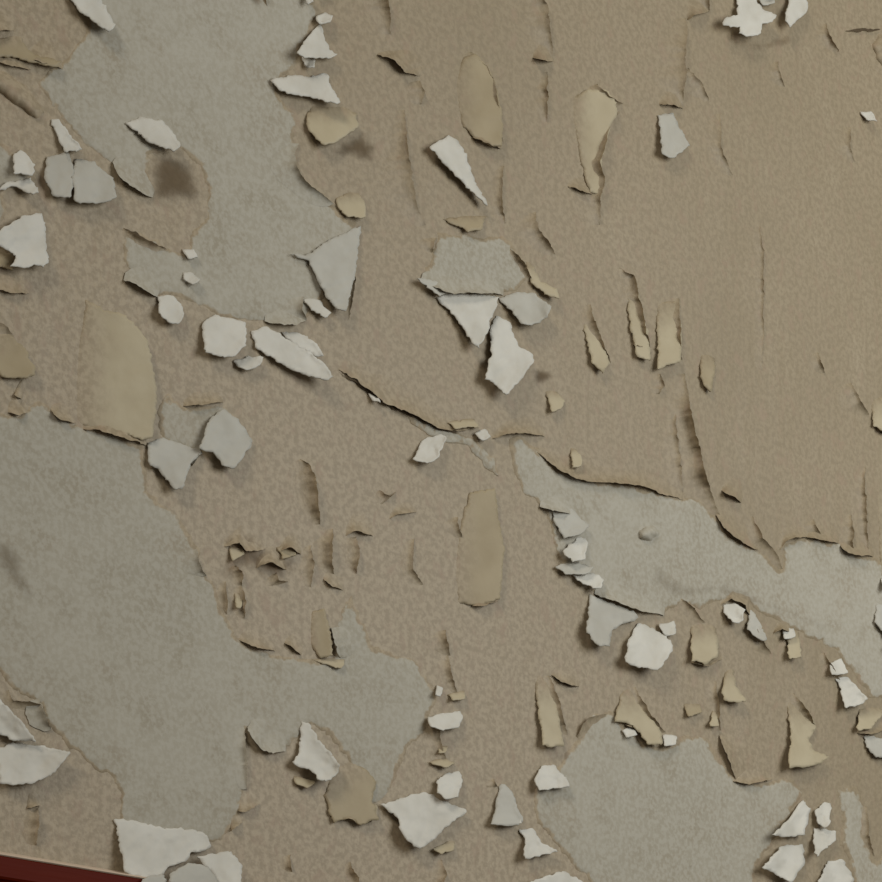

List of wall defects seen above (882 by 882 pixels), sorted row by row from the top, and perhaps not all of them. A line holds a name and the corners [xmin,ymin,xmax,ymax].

peeling [0,0,366,381]
peeling [361,0,391,35]
peeling [378,50,425,105]
peeling [457,52,504,149]
peeling [417,135,559,395]
peeling [0,300,467,882]
peeling [403,412,499,476]
peeling [509,268,882,768]
peeling [485,667,882,882]